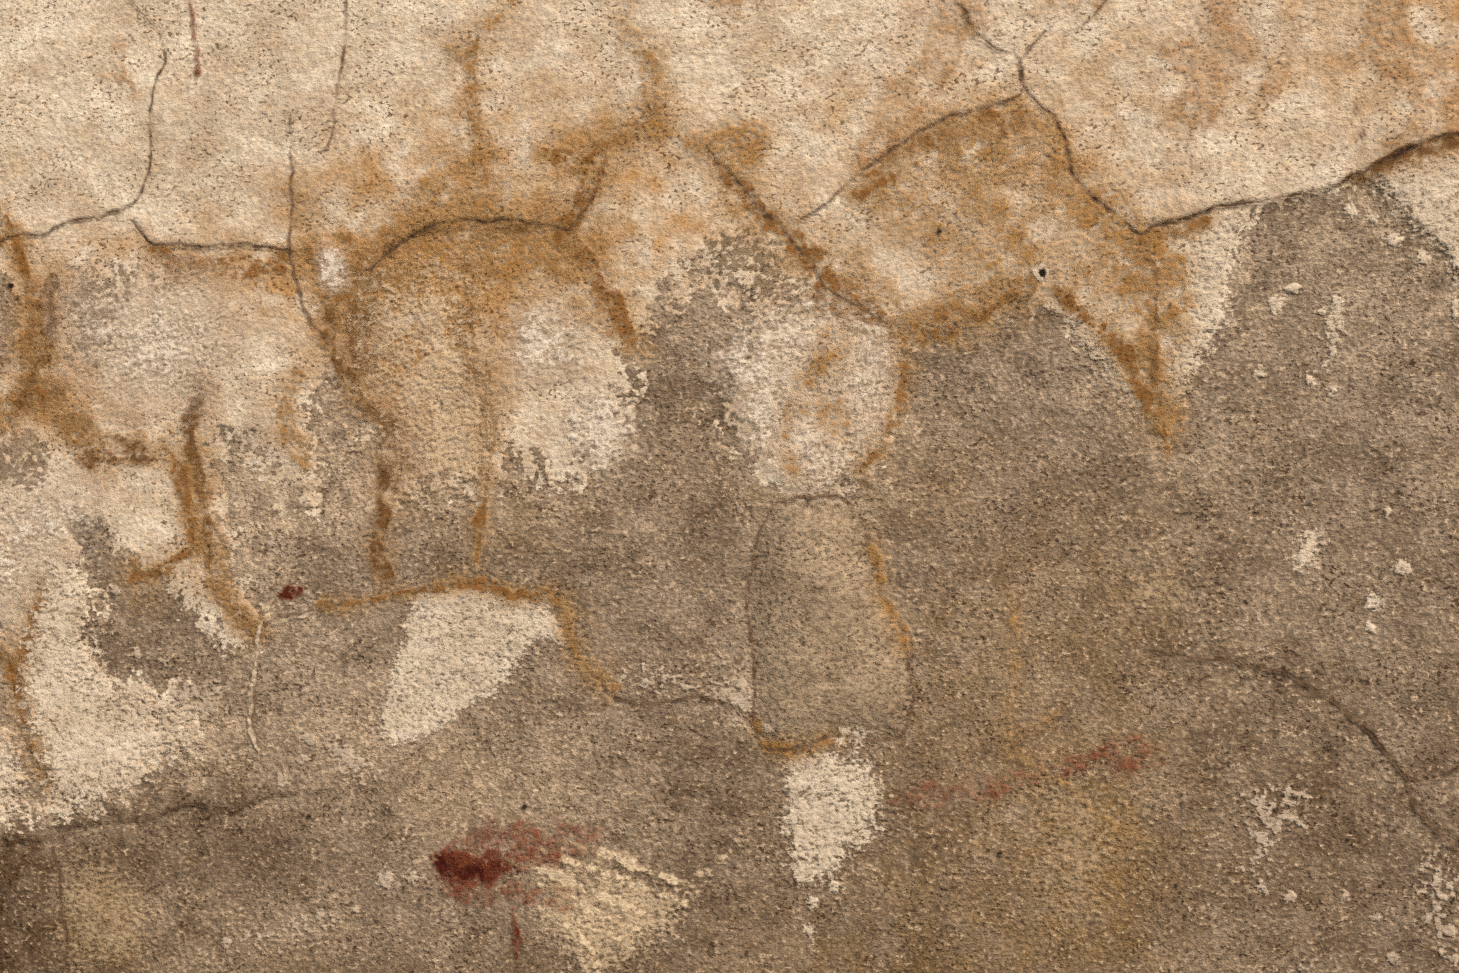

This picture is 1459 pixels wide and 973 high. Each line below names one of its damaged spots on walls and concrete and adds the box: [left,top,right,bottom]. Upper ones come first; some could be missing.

crack [0,0,348,339]
crack [371,196,594,269]
crack [706,1,1459,321]
damp [279,585,303,600]
crack [14,602,344,973]
crack [604,686,759,732]
crack [1137,651,1459,853]